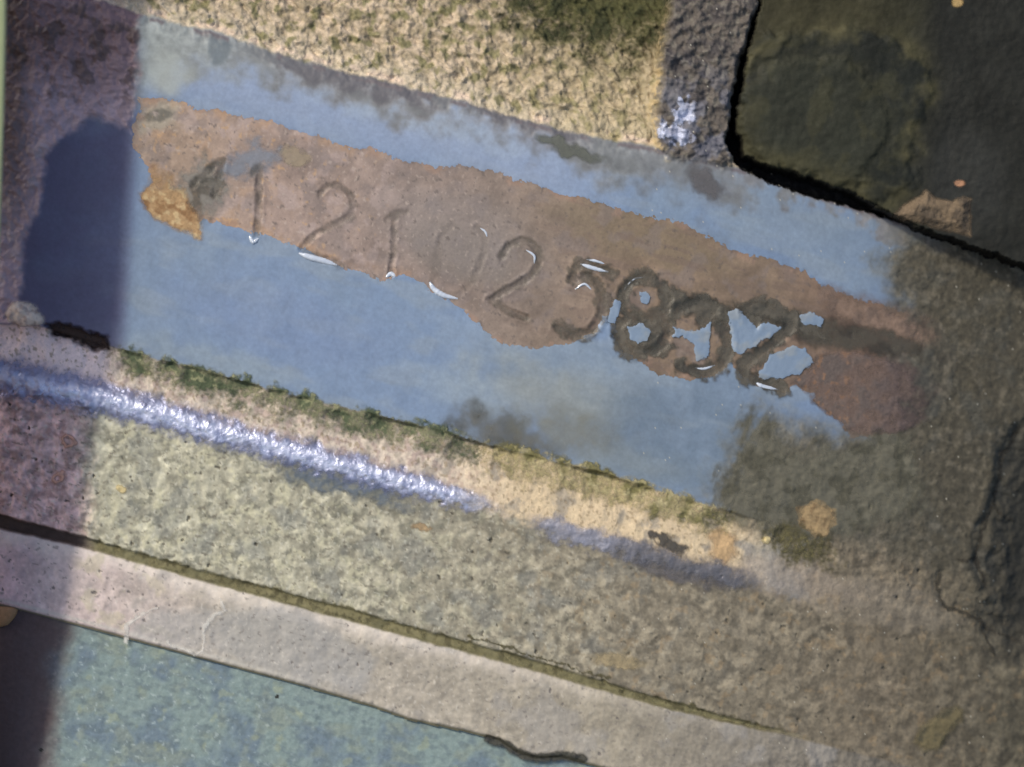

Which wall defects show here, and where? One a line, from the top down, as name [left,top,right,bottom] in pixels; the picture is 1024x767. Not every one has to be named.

efflorescence [657,94,696,146]
peeling [132,97,957,433]
crack [935,427,1020,655]